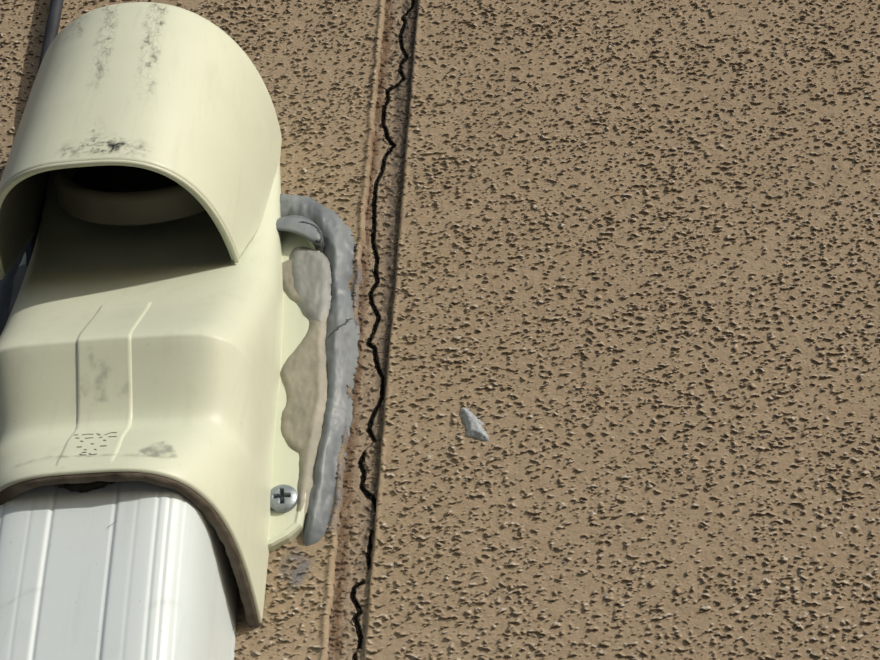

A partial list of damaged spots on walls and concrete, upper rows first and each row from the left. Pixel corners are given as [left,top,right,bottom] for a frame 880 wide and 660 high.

crack [351,0,415,660]